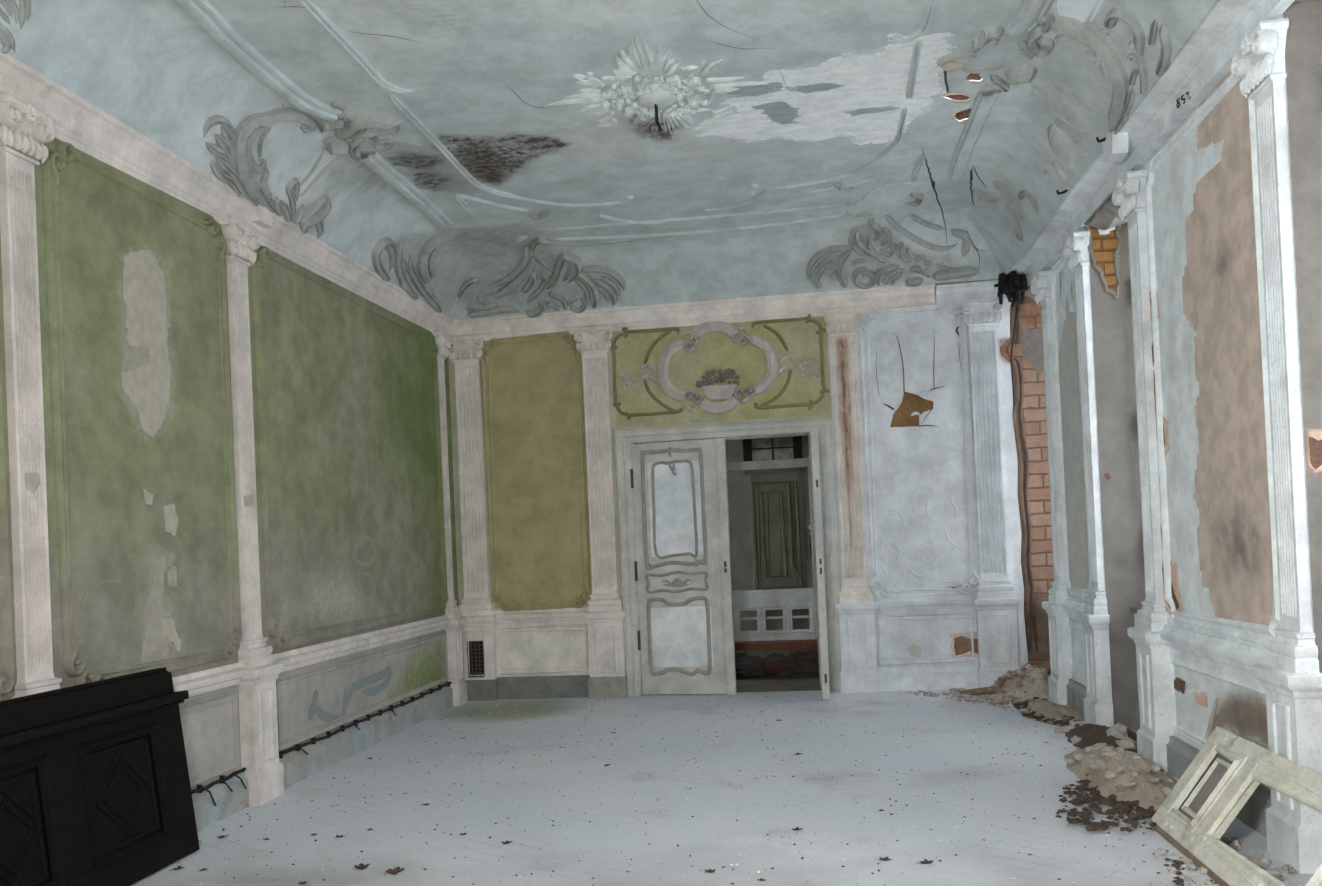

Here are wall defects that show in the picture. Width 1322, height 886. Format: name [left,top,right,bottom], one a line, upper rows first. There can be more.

crack [697,0,787,86]
peeling [692,32,982,145]
flaking render [1084,192,1128,300]
peeling [118,248,175,439]
spalling [876,336,947,427]
peeling [1182,70,1275,626]
spalling [1308,430,1322,473]
peeling [143,489,178,536]
spalling [951,632,978,657]